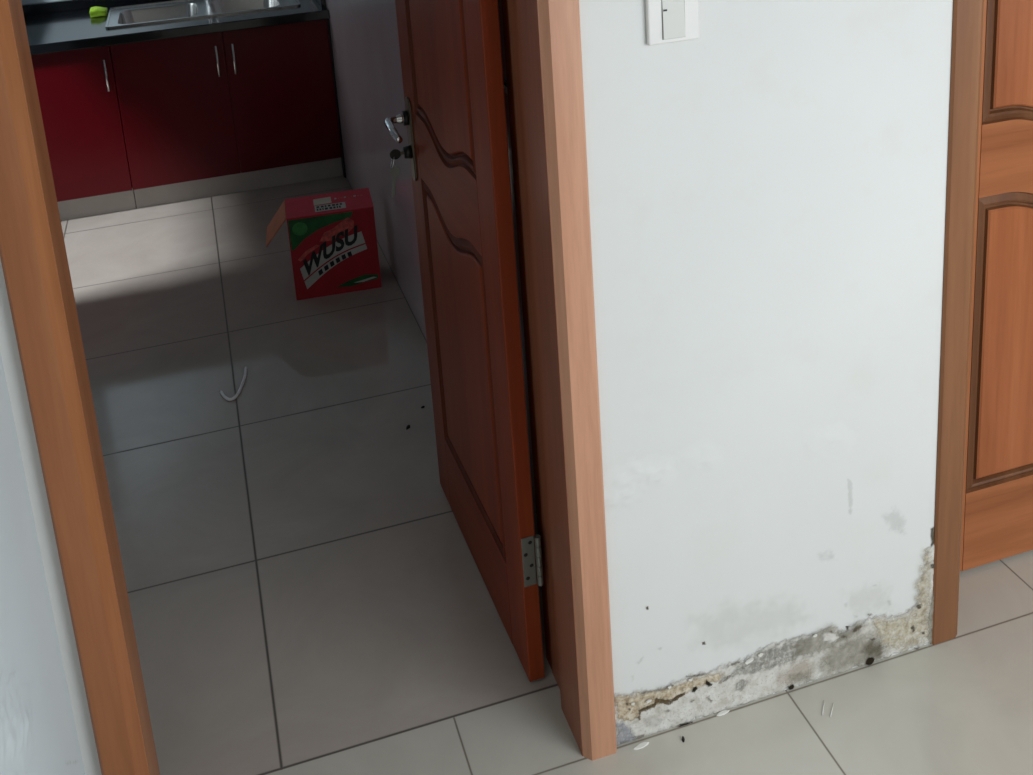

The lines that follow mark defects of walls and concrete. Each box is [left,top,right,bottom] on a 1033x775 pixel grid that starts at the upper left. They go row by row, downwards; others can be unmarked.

spalling [614,544,934,745]